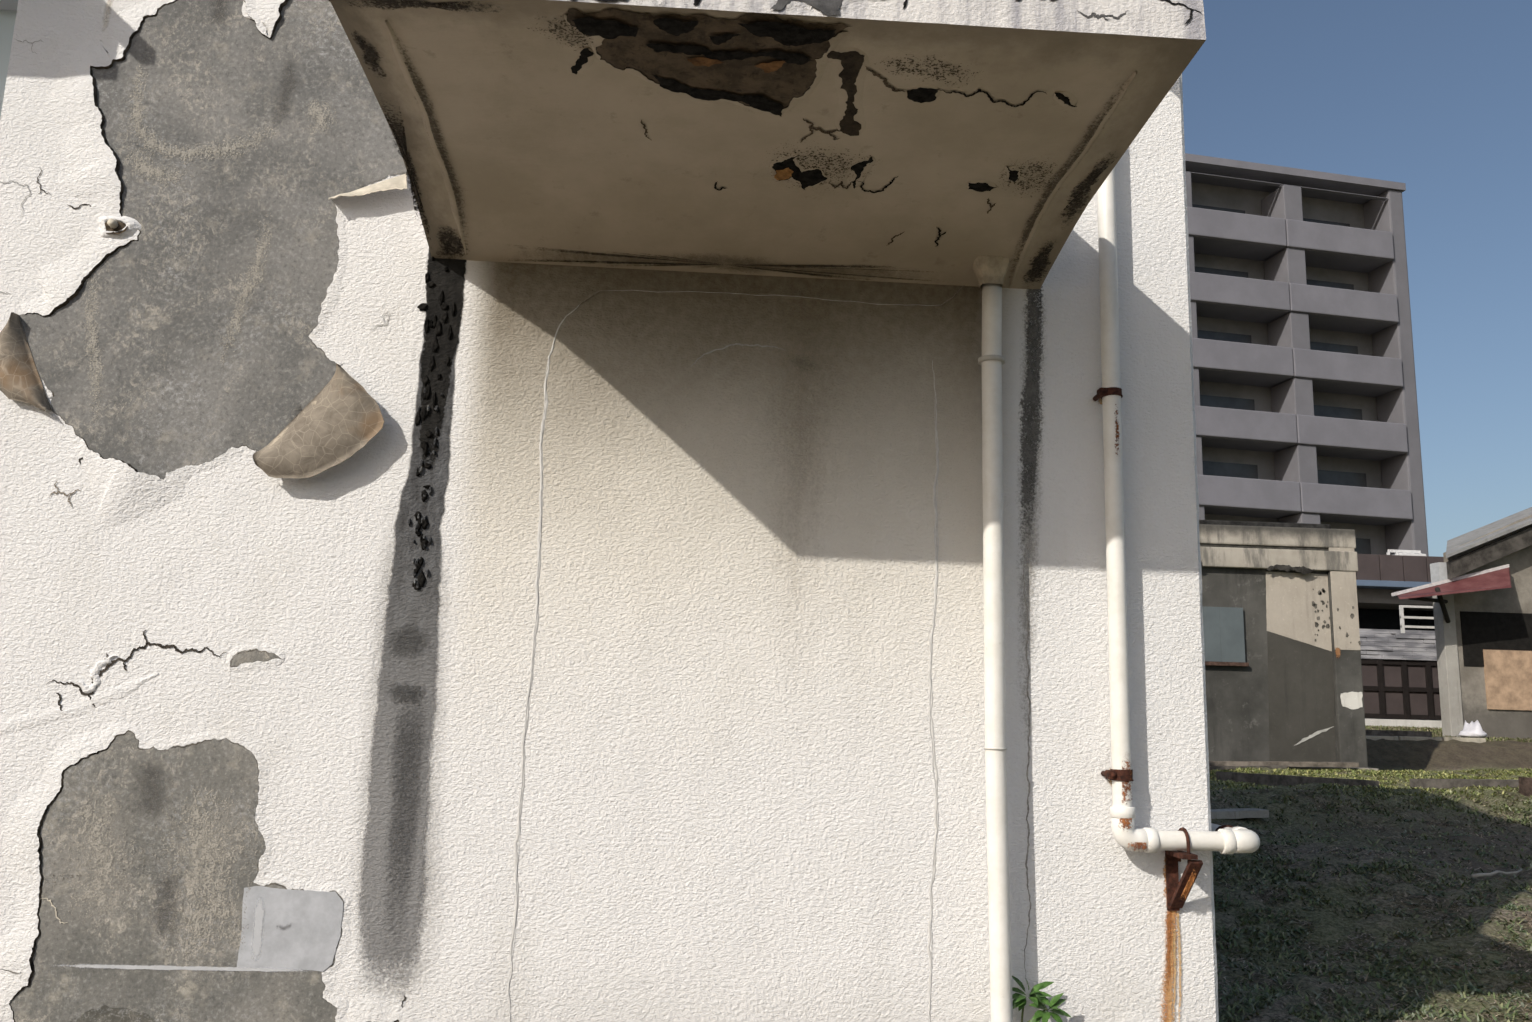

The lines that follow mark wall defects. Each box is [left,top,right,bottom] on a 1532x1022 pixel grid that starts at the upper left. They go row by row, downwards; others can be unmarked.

water stain [353,32,386,77]
water stain [350,0,497,12]
spalling [564,0,1078,136]
crack [1017,0,1202,24]
spalling [769,153,898,193]
spalling [967,166,1022,192]
peeling [0,0,408,527]
water stain [359,105,468,979]
crack [48,630,226,715]
crack [508,285,965,1022]
peeling [0,722,423,1022]
rust [1161,858,1196,1022]